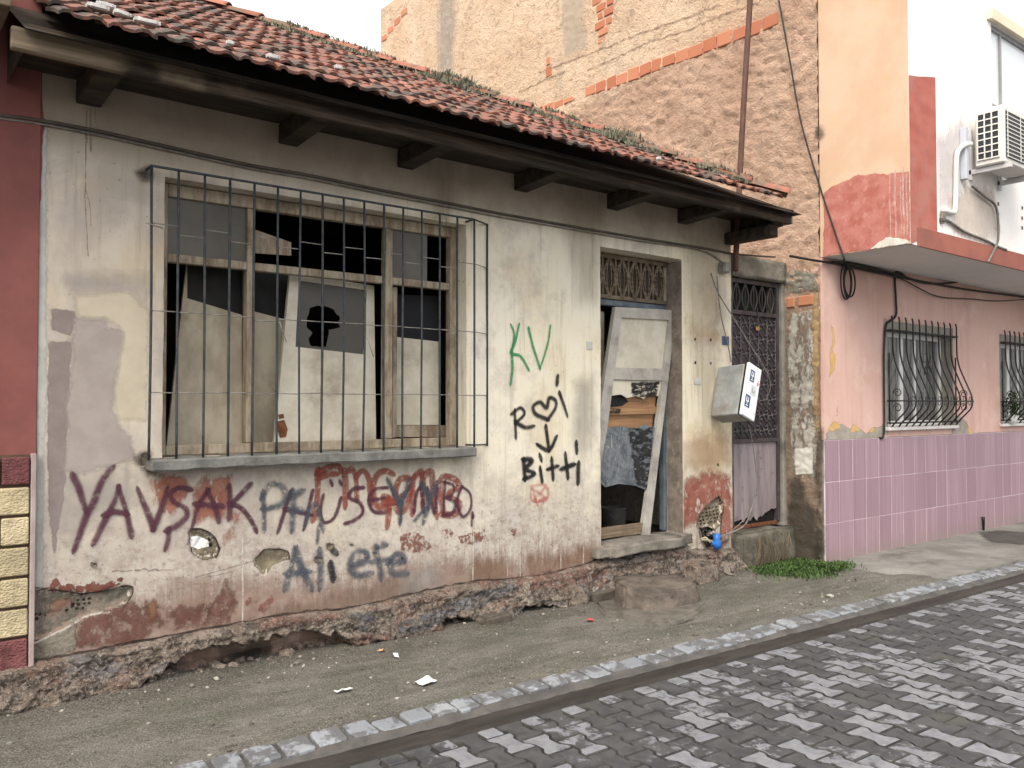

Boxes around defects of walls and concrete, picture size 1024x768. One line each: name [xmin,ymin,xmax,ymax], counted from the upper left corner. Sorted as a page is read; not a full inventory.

spalling [871,237,909,249]
peeling [786,294,888,477]
peeling [154,475,240,560]
peeling [684,471,733,550]
spalling [253,548,290,574]
spalling [34,578,337,659]